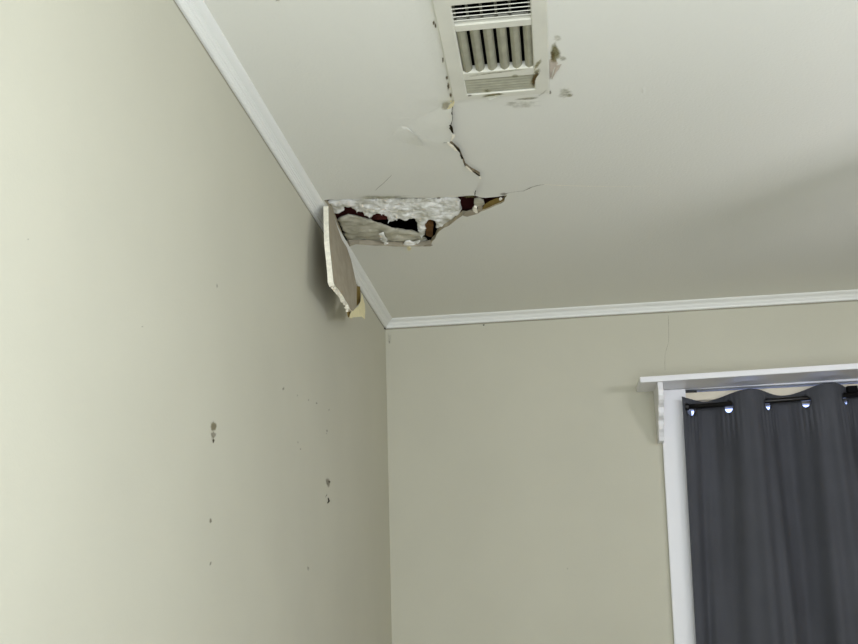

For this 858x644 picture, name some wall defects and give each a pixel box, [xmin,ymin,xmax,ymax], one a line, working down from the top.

crack [446,107,481,195]